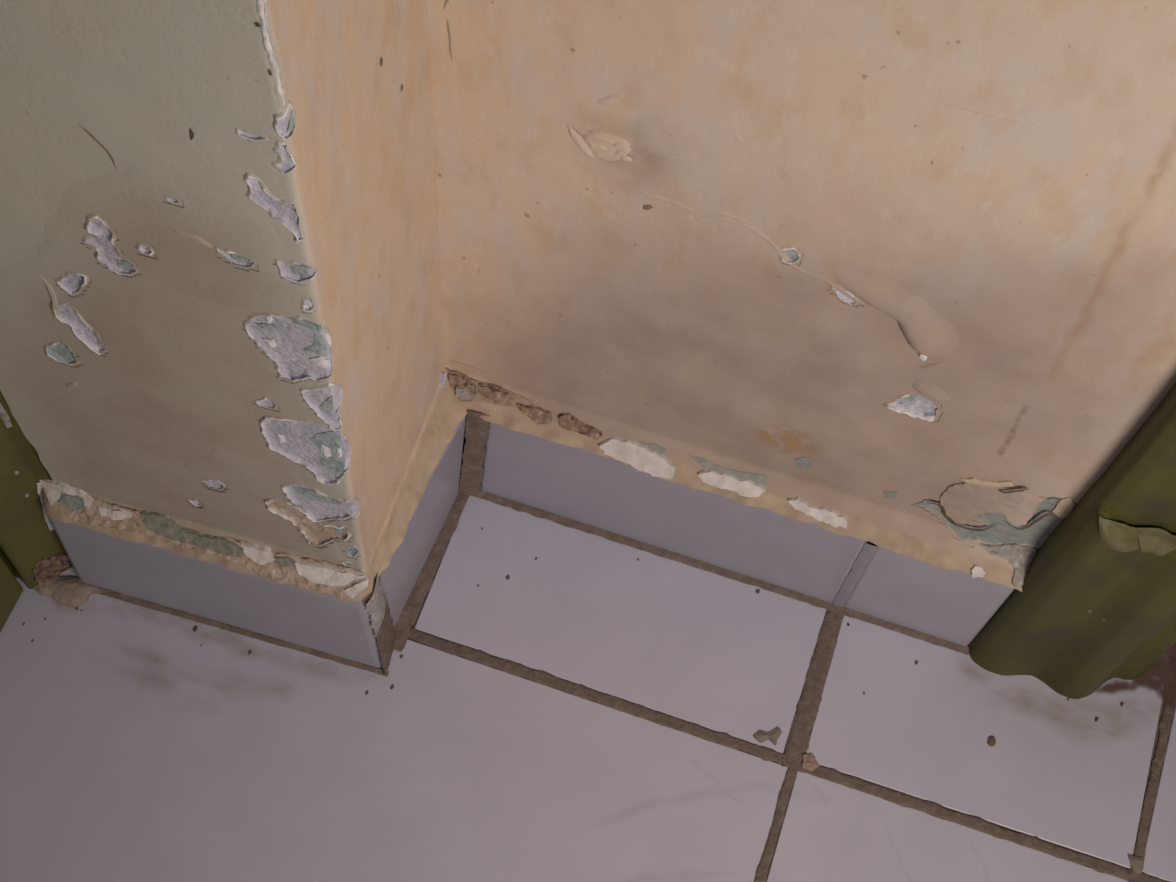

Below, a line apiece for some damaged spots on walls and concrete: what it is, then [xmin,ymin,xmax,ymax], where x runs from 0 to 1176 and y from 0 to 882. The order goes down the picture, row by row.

peeling [235,0,297,176]
peeling [243,172,306,244]
peeling [82,214,156,276]
peeling [214,246,257,269]
spalling [25,259,369,601]
spalling [439,367,603,440]
peeling [884,380,951,422]
spalling [916,477,1075,586]